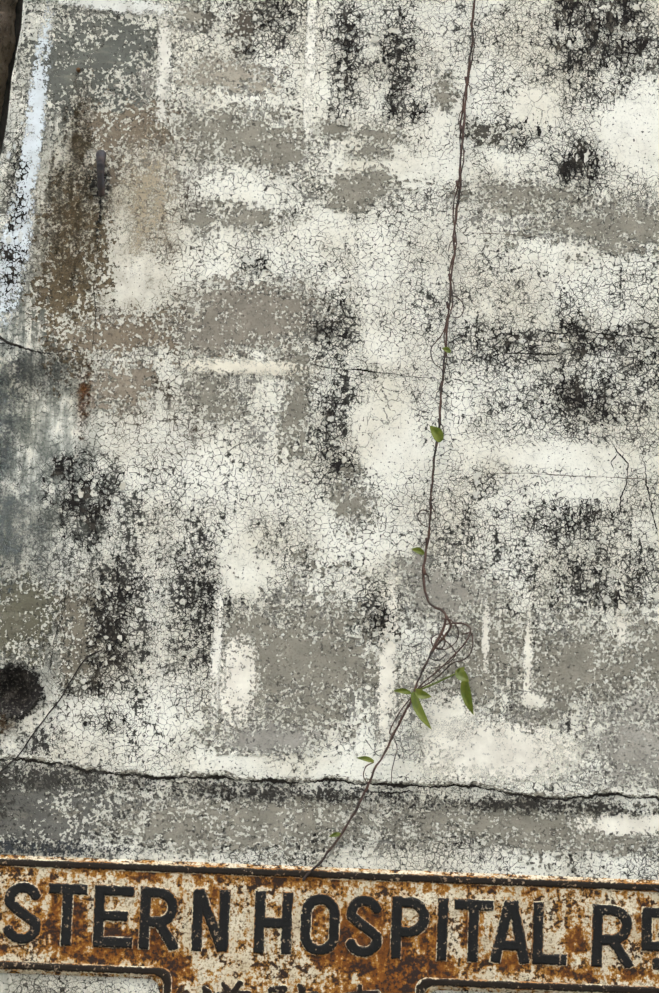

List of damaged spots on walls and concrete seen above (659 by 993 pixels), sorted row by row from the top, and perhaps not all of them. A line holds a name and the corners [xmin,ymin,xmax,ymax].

peeling [0,0,659,544]
peeling [0,446,165,734]
peeling [0,538,659,878]
crack [0,754,659,806]